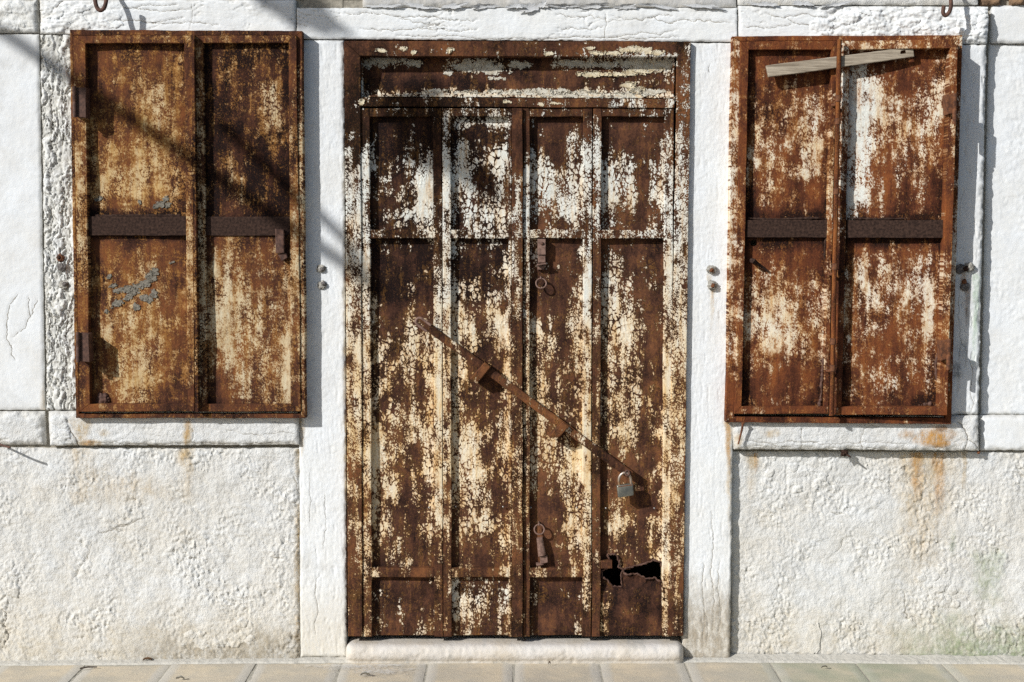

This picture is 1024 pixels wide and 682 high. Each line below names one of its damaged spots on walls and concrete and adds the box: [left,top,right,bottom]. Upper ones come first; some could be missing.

crack [6,294,69,390]
rust [921,427,948,472]